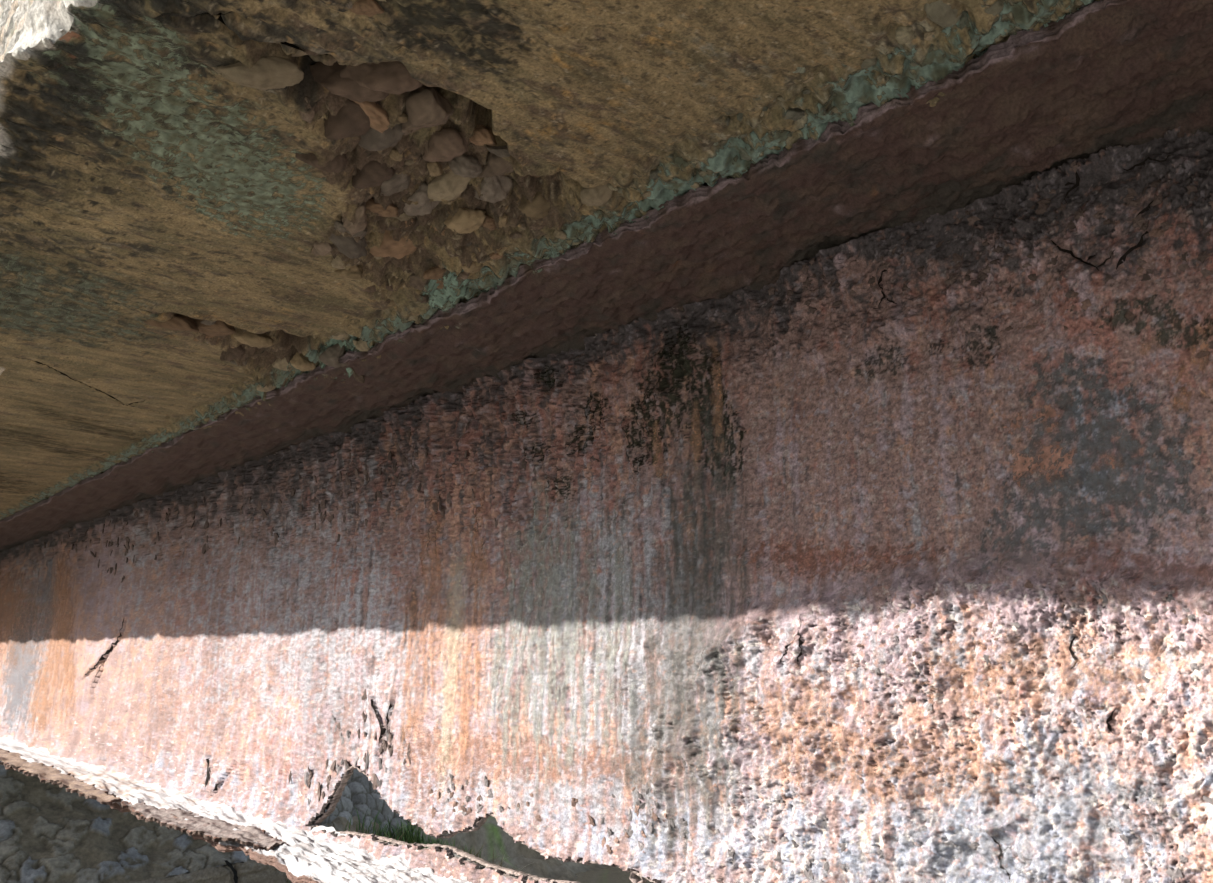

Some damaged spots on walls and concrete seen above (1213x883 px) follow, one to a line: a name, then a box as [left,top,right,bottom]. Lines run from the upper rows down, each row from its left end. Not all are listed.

water stain [0,0,225,202]
spalling [215,47,581,307]
crack [1051,201,1153,271]
crack [22,358,160,413]
water stain [622,324,746,490]
crack [85,619,124,677]
corrosion [1091,652,1168,709]
corrosion [289,689,411,807]
corrosion [428,773,542,825]
corrosion [588,782,688,854]
crack [224,860,238,883]
corrosion [769,836,849,883]